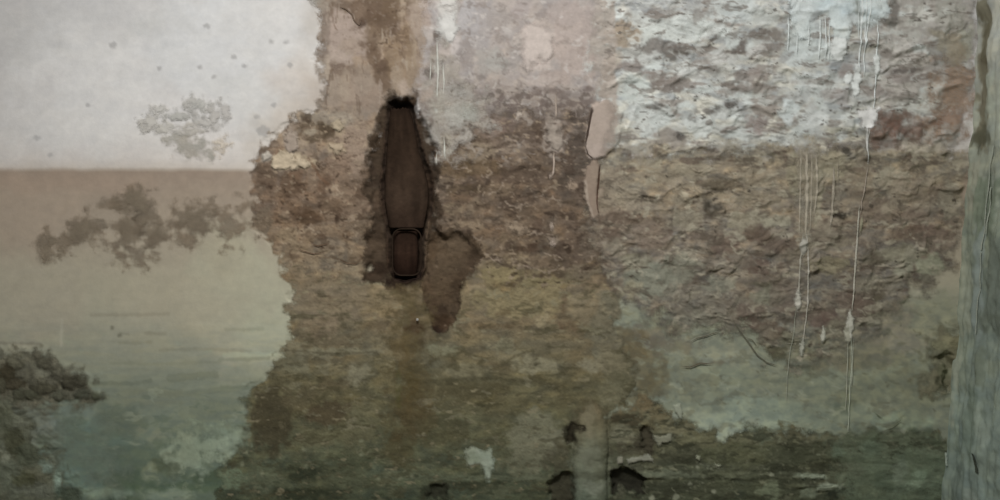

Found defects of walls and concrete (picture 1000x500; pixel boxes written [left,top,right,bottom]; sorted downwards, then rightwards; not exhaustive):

leakage [31,183,258,273]
peeling [134,93,235,165]
leakage [360,39,502,333]
flaking render [212,0,948,500]
efflorescence [786,145,839,401]
leakage [842,128,870,431]
flaking render [908,319,960,405]